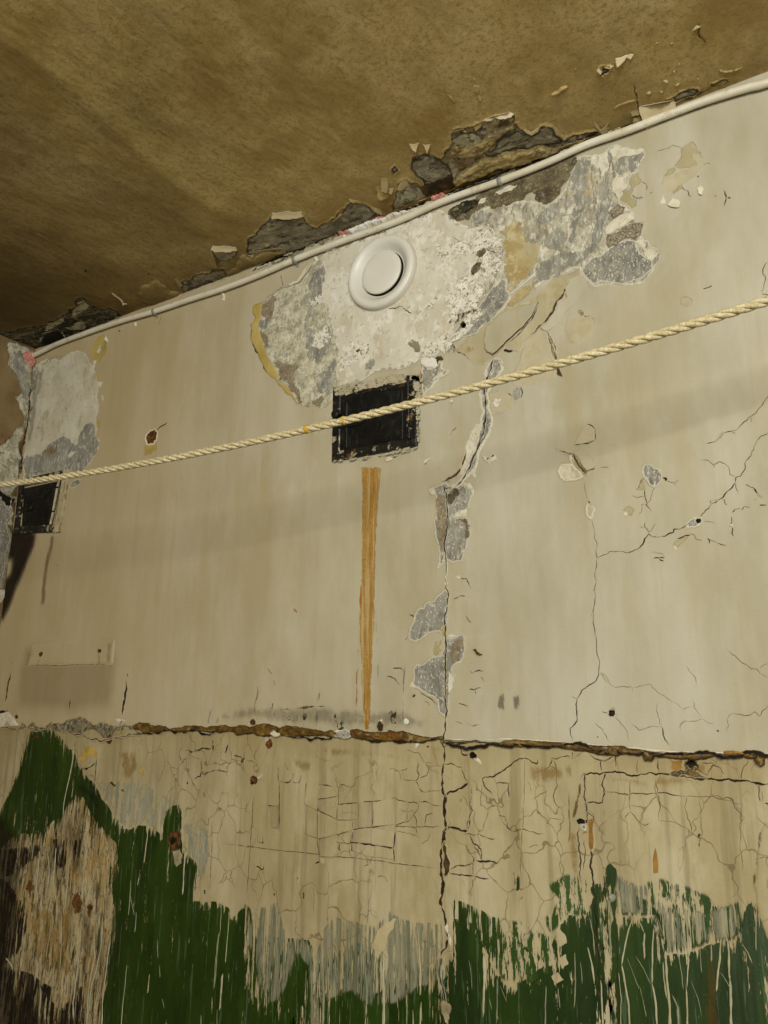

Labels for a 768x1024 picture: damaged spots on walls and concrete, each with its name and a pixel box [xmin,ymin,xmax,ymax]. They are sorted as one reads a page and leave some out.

flaking render [137,112,711,417]
flaking render [0,330,121,604]
crack [185,740,302,784]
crack [246,796,254,897]
rust [355,467,381,730]
peeling [0,709,768,1024]
peeling [407,482,485,728]
crack [386,343,768,1024]
peeling [555,423,609,482]
flaking render [622,462,679,518]